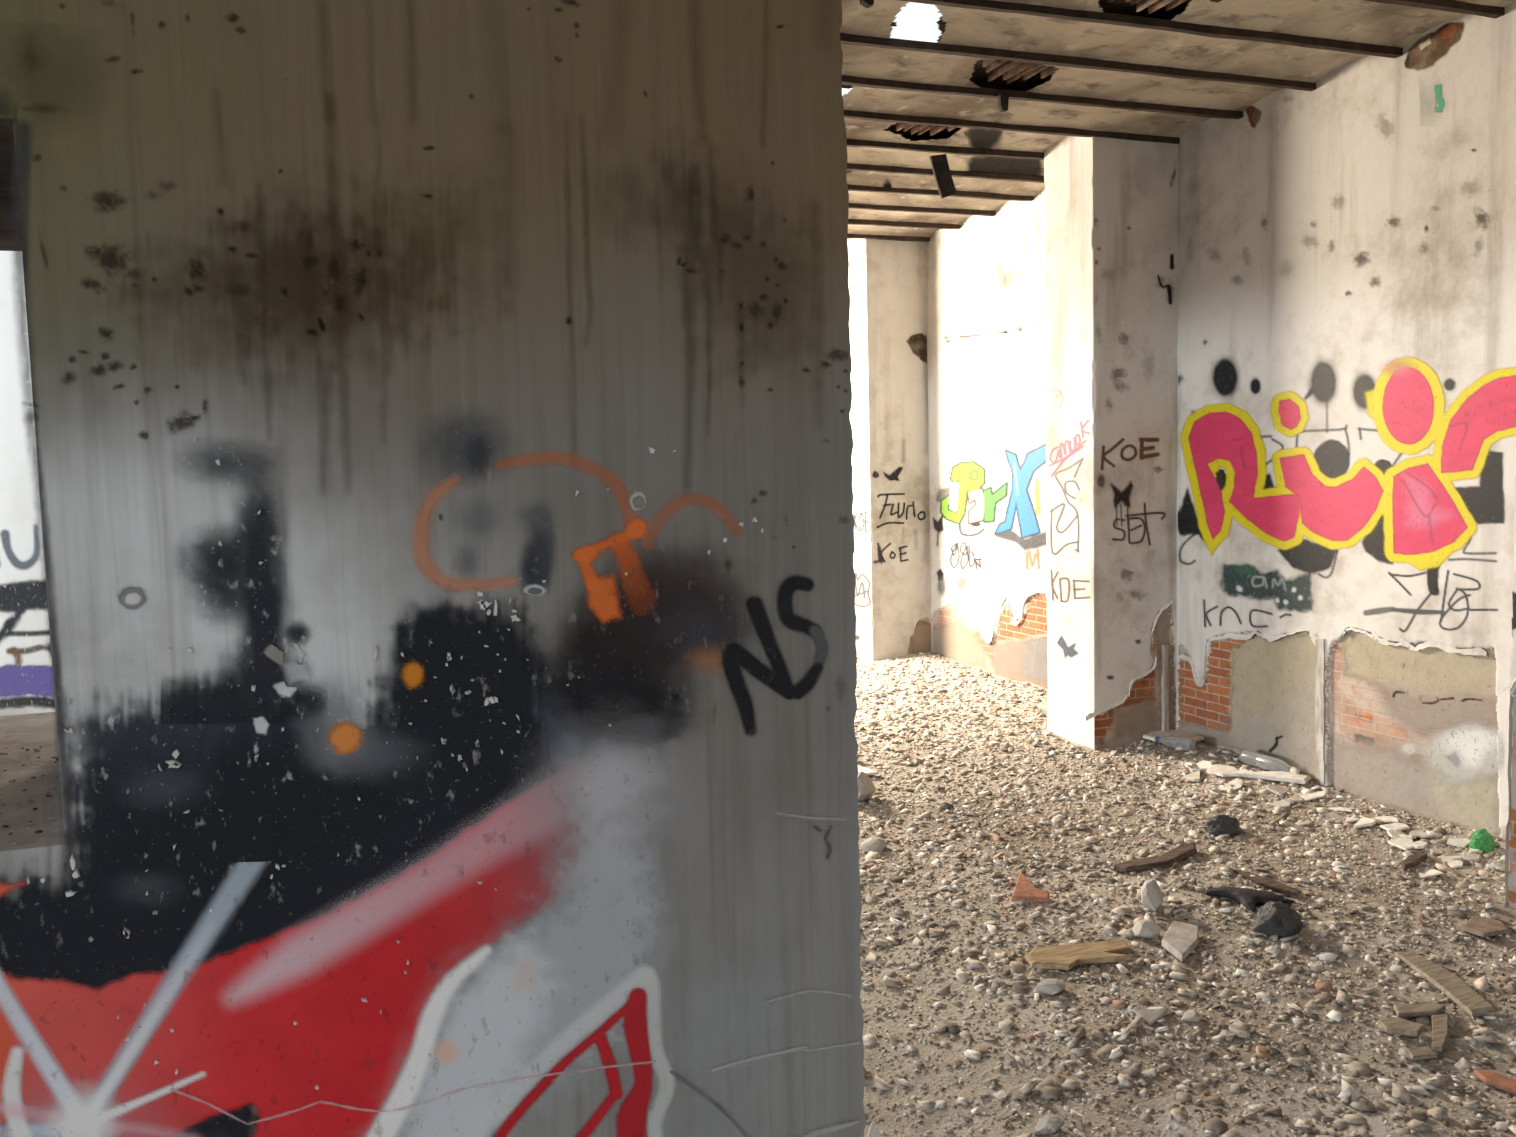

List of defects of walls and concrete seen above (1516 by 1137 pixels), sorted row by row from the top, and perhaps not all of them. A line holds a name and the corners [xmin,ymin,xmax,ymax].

spalling [1097,0,1187,15]
spalling [971,59,1059,84]
leakage [186,216,441,335]
leakage [66,331,135,388]
leakage [170,401,206,430]
leakage [0,101,72,860]
flaking render [909,589,1048,689]
flaking render [1086,598,1516,910]